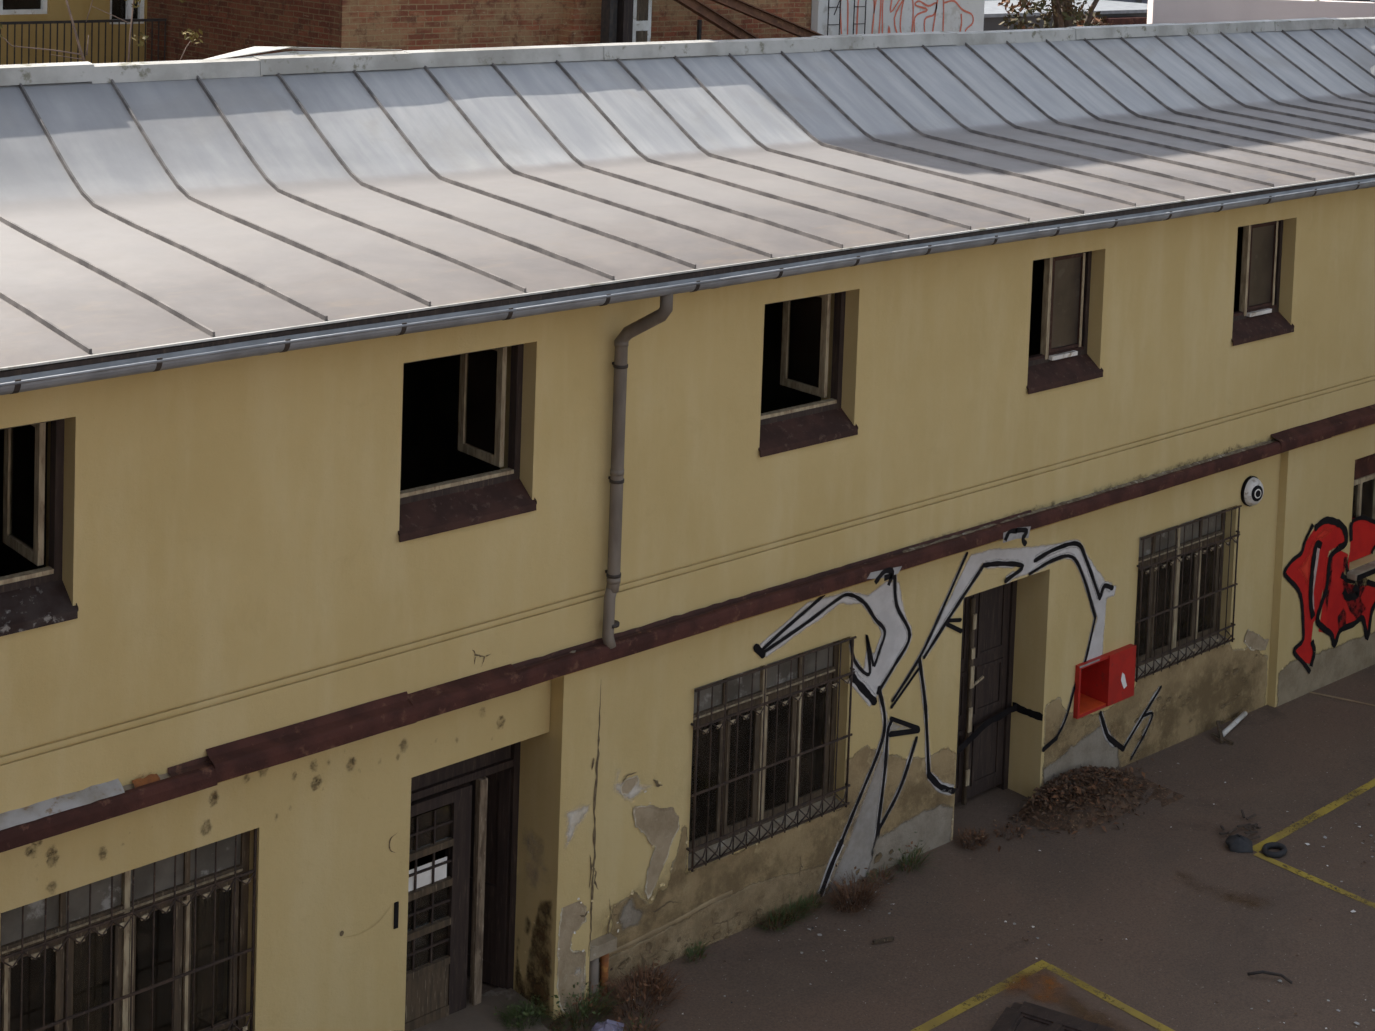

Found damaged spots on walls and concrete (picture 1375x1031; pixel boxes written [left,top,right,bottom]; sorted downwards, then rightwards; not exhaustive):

corrosion [132,774,160,788]
flaking render [556,745,956,1014]